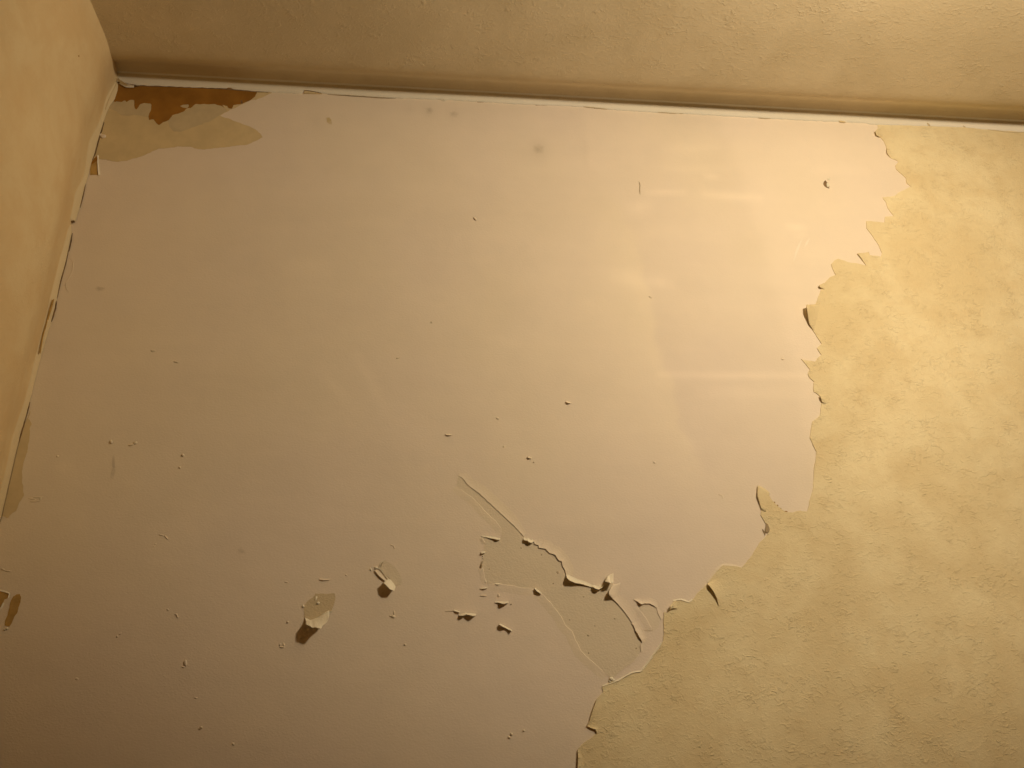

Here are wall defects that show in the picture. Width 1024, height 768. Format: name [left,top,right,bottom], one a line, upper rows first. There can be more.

peeling [0,78,910,768]